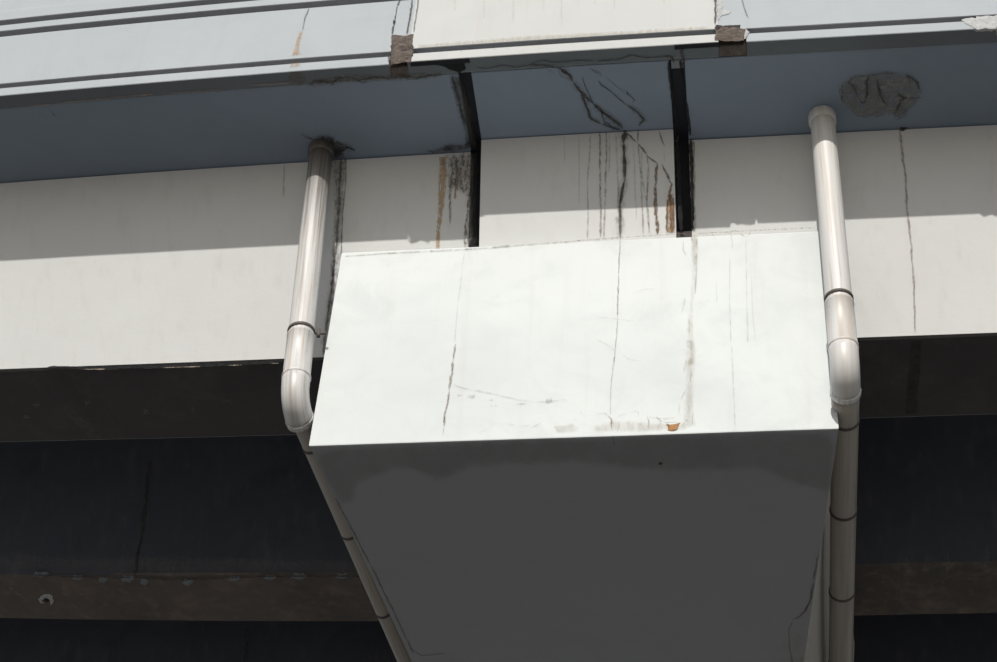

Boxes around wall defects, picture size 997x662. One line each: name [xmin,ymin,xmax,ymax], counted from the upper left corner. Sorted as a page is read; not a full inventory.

spalling [388,34,414,64]
crack [392,0,419,34]
spalling [714,25,749,41]
peeling [962,15,997,35]
crack [479,49,685,182]
rust [436,157,462,249]